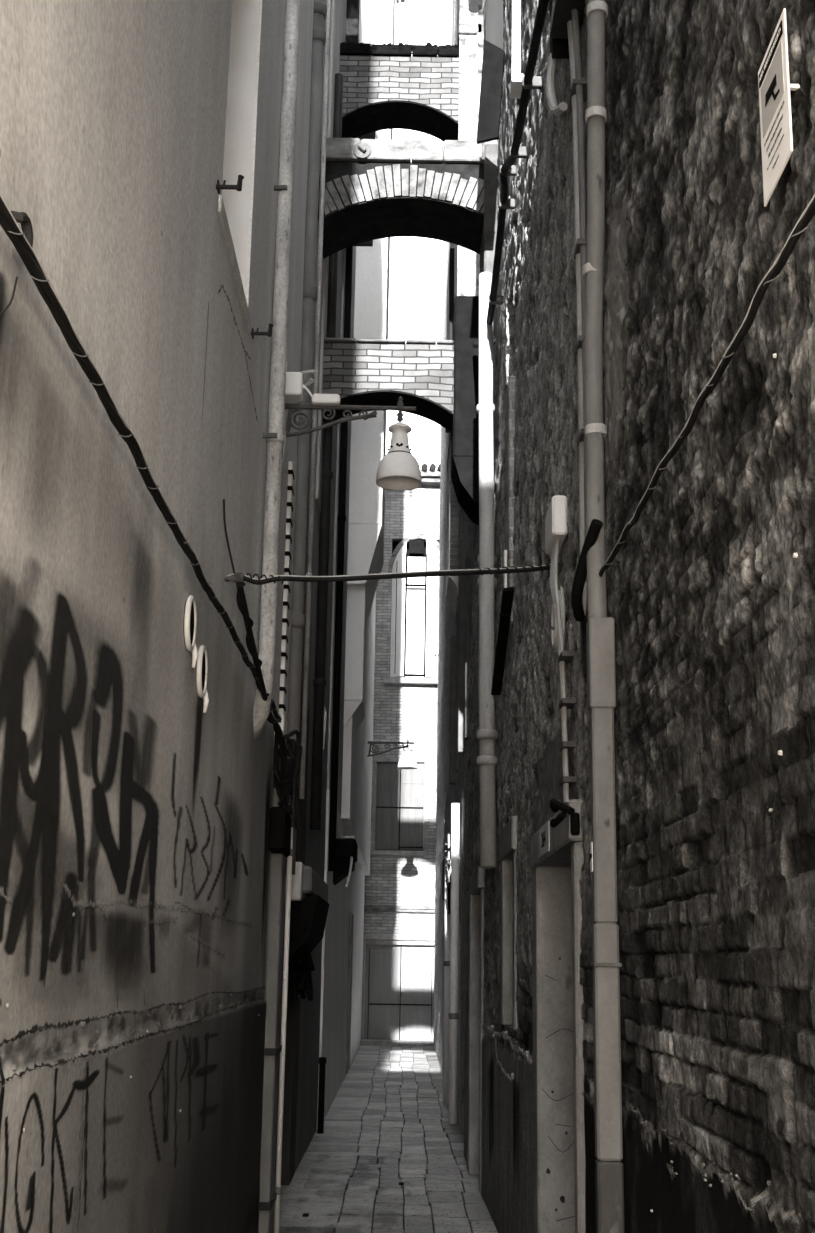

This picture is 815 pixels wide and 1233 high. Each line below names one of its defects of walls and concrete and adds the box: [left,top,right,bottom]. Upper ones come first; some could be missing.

crack [0,985,266,1084]